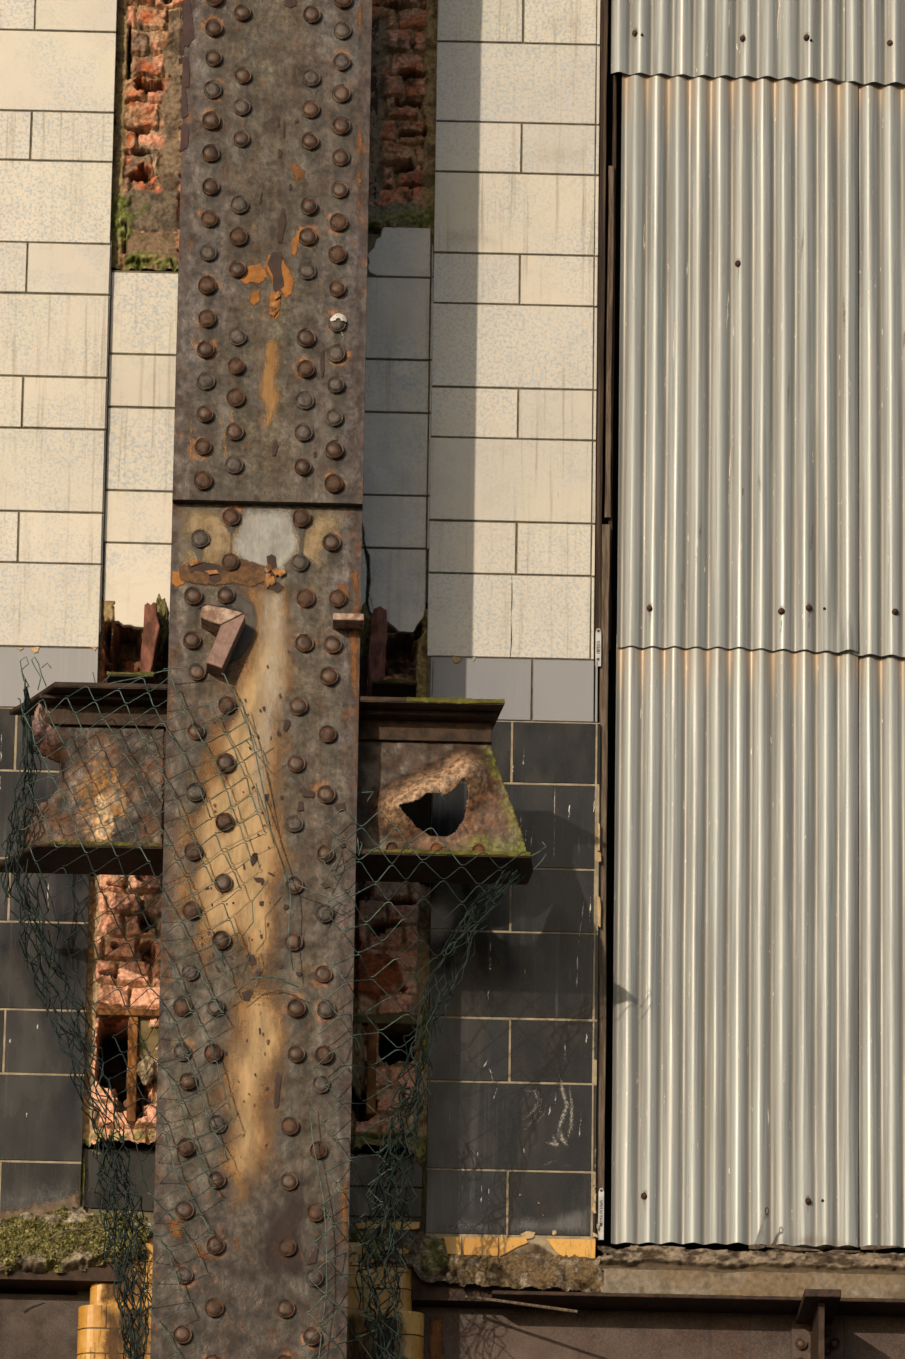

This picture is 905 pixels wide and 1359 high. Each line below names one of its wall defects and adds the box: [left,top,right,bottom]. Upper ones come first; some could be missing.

spalling [111,0,194,272]
spalling [368,0,438,235]
rust [241,226,304,319]
rust [261,340,279,426]
spalling [91,601,163,684]
rust [171,571,185,587]
rust [338,571,359,720]
spalling [384,609,428,698]
rust [177,589,291,1190]
spalling [83,875,163,1147]
spalling [351,881,431,1163]